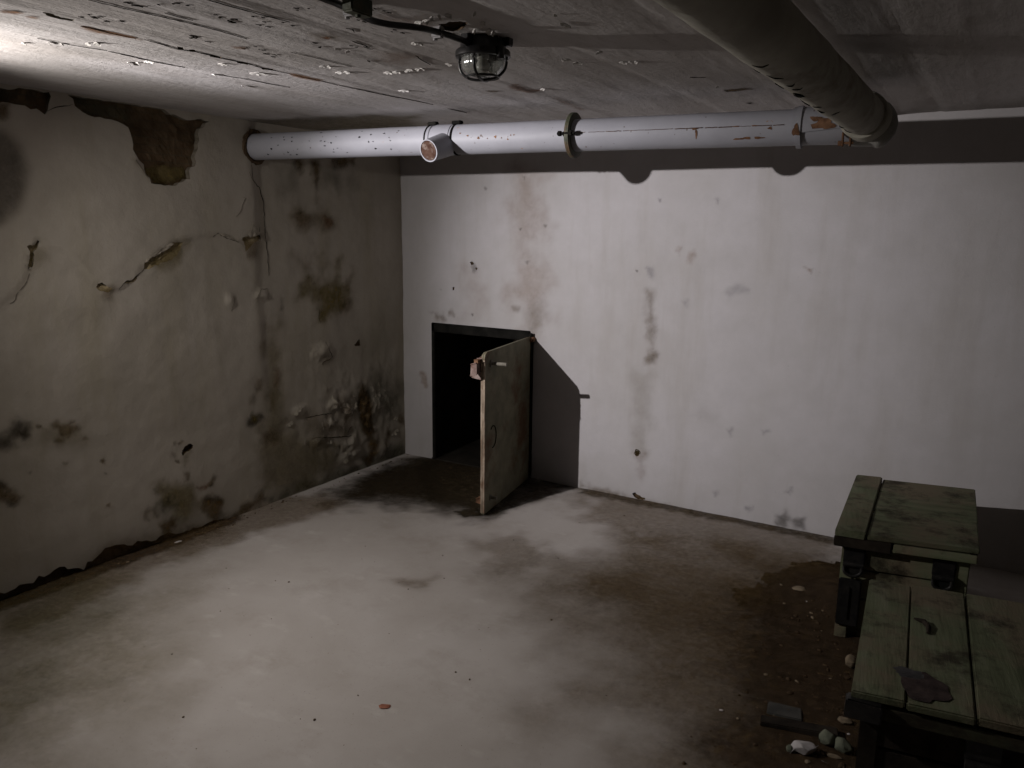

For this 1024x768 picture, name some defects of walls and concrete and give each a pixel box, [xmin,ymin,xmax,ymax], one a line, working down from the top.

flaking render [0,88,51,118]
flaking render [69,95,208,186]
corrosion [792,116,836,136]
flaking render [0,493,262,601]
damp [0,478,278,619]